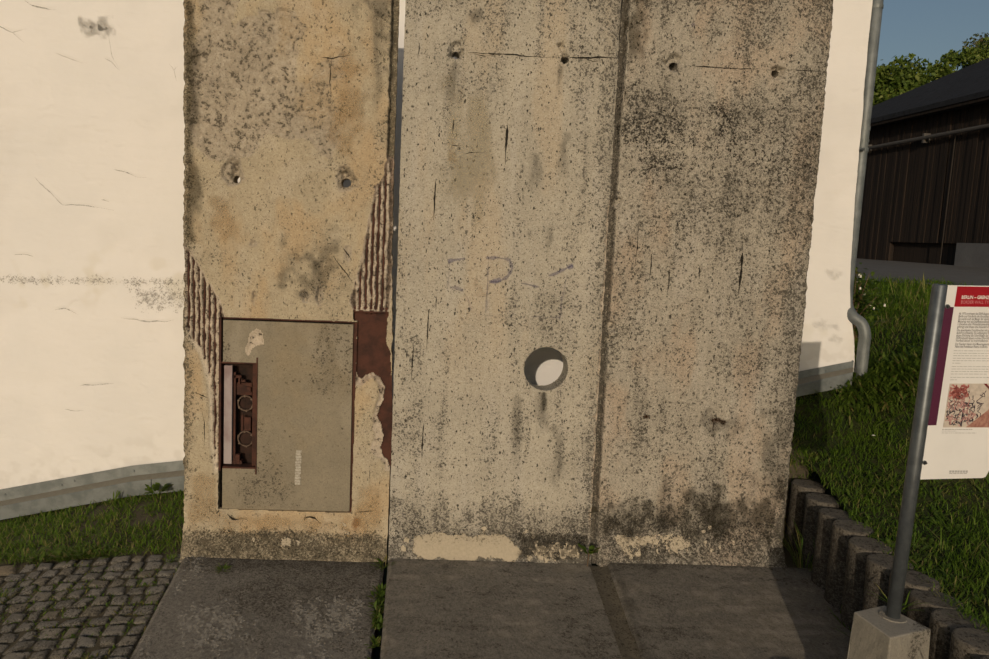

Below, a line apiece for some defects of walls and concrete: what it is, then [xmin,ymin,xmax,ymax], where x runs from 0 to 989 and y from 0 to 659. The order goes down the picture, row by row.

spalling [188,0,359,192]
spalling [448,39,467,59]
spalling [661,51,684,73]
spalling [343,155,394,314]
spalling [299,283,323,308]
spalling [184,245,226,470]
spalling [355,363,390,471]